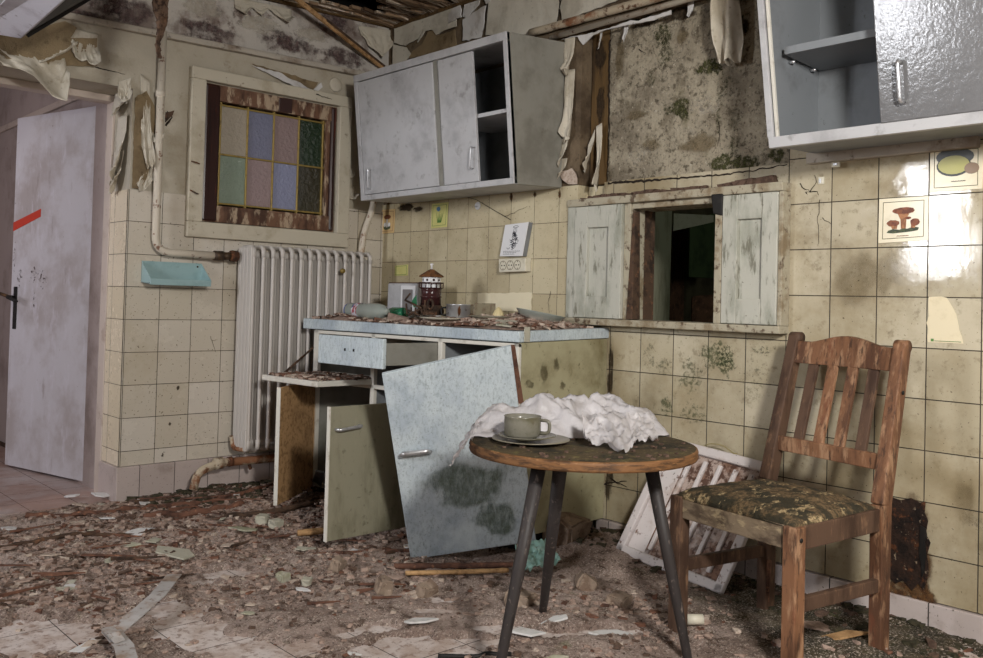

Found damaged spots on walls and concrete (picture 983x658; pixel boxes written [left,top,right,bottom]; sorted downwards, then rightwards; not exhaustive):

damp [70,0,154,25]
damp [632,5,695,27]
spalling [0,21,97,66]
mould [186,20,233,43]
mould [263,31,361,67]
damp [681,136,713,150]
spalling [560,168,578,184]
damp [605,473,613,499]